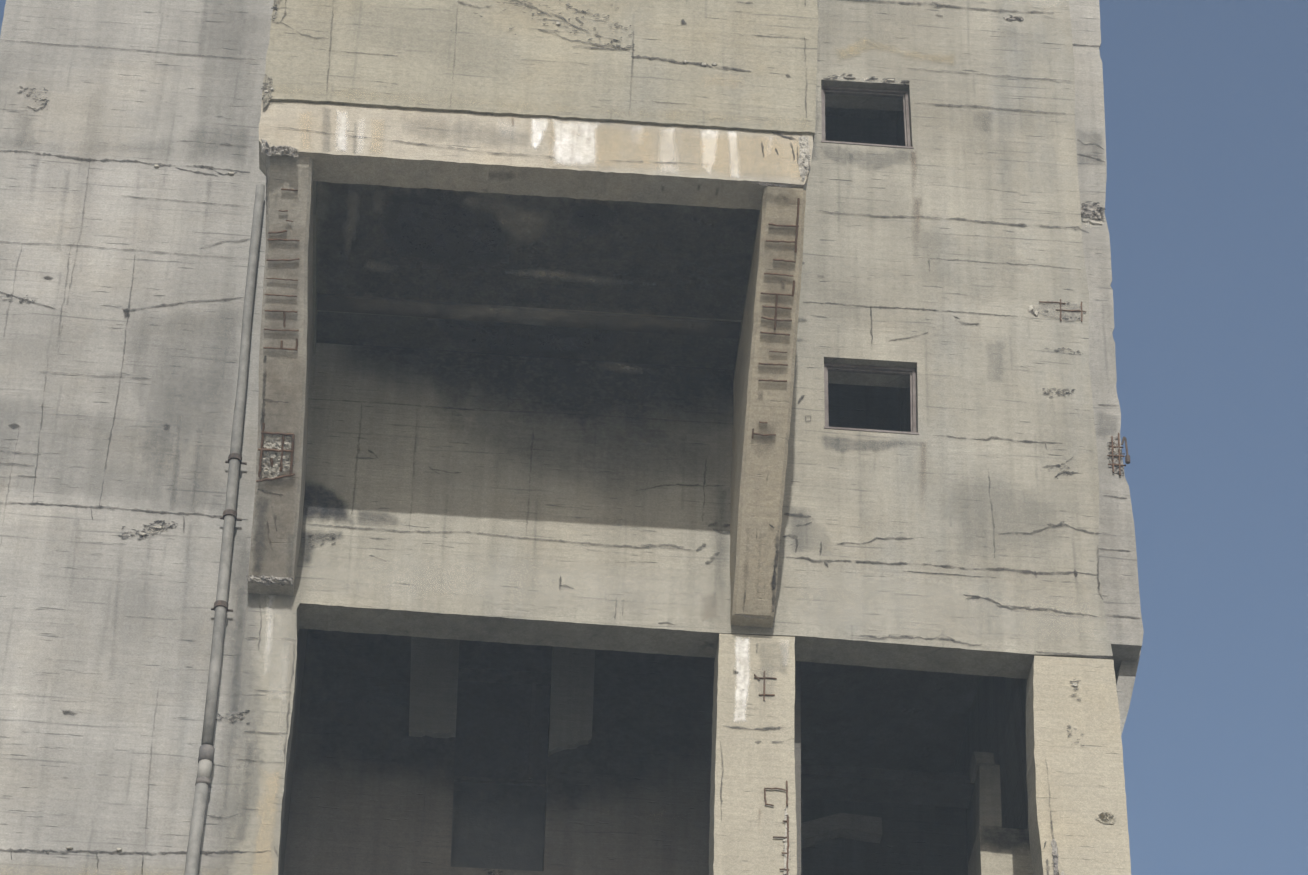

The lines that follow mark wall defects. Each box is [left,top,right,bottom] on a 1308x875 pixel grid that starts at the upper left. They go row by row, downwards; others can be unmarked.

crack [848,0,1050,16]
crack [458,0,751,72]
crack [5,141,268,214]
spalling [1081,201,1105,226]
crack [128,297,241,312]
crack [4,452,730,564]
crack [733,513,1140,619]
crack [869,635,975,646]
crack [1036,650,1113,658]
crack [1,846,269,874]